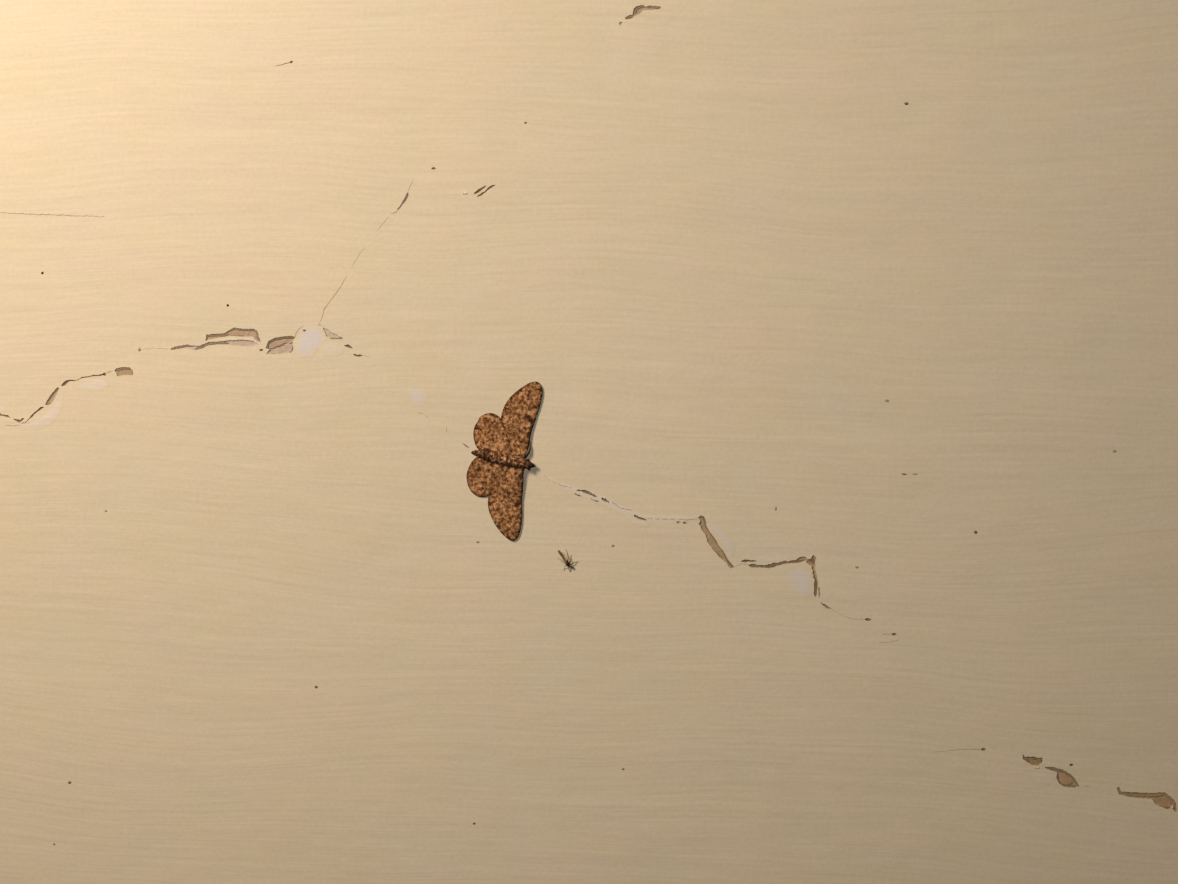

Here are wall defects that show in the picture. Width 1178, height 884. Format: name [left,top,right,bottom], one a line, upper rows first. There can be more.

crack [381,167,436,226]
crack [6,371,112,430]
crack [537,468,698,528]
crack [736,554,898,643]
peeling [1117,787,1177,811]